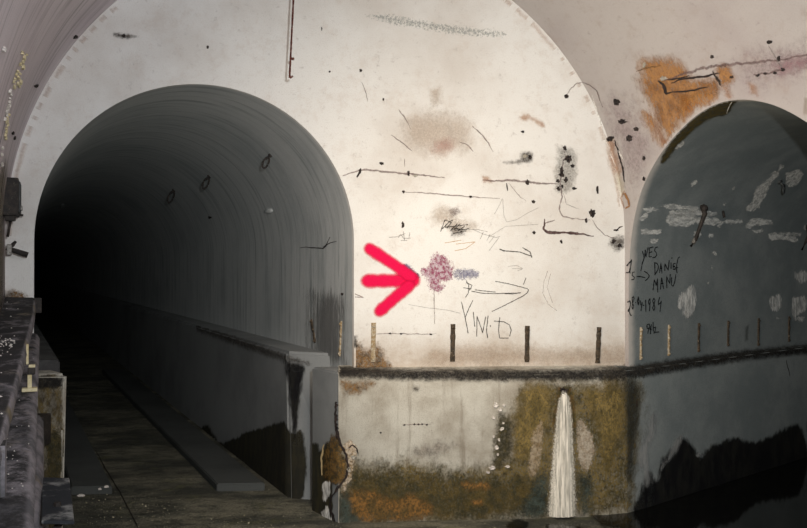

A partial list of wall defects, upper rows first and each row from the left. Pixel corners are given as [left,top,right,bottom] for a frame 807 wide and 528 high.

rust [636,59,732,145]
peeling [639,164,806,244]
damp [196,326,333,519]
spalling [320,402,358,522]
damp [339,344,807,511]